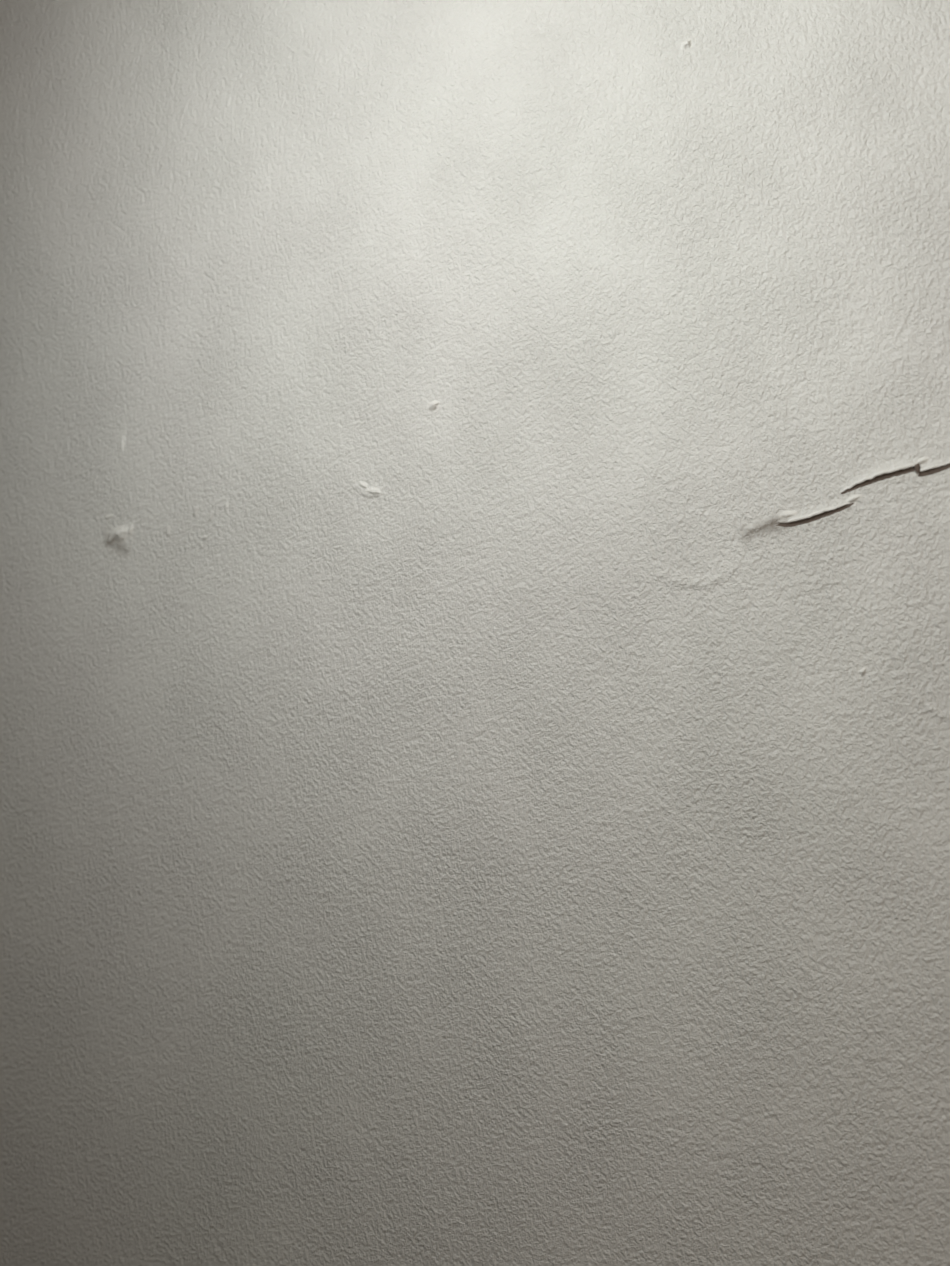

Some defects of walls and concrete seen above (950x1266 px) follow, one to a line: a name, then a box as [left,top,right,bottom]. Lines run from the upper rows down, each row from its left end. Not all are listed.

crack [739,454,950,537]